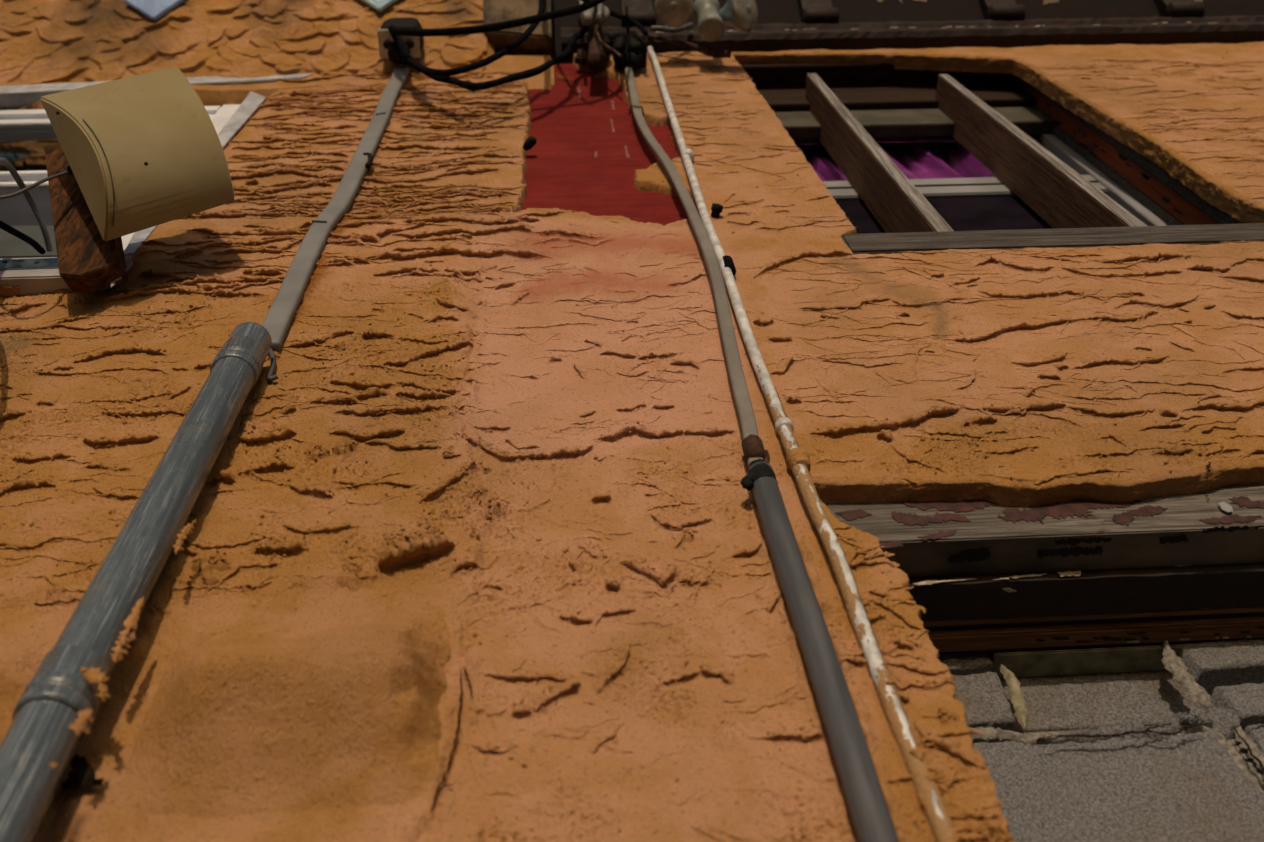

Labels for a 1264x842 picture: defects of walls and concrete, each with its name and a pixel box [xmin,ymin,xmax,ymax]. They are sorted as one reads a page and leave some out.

spalling [521,64,688,226]
peeling [835,509,872,521]
peeling [891,499,1168,541]
peeling [1199,496,1264,533]
peeling [913,578,977,586]
peeling [992,536,1112,592]